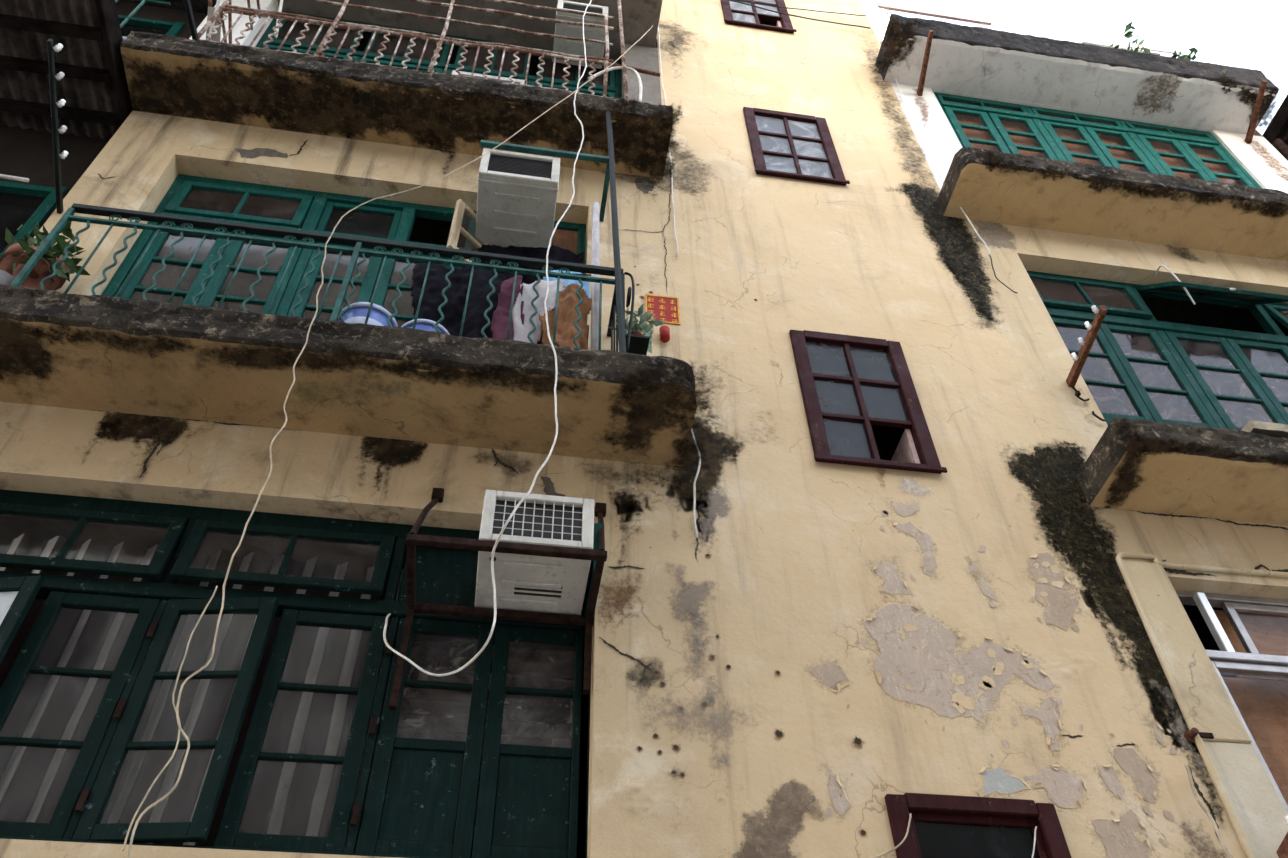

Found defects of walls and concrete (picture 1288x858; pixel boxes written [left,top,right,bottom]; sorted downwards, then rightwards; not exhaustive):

water stain [123,56,682,195]
water stain [1134,72,1181,115]
water stain [947,261,993,317]
water stain [0,316,586,396]
water stain [96,412,189,453]
water stain [359,436,428,484]
water stain [601,362,743,551]
water stain [610,492,641,564]
crack [1103,508,1288,530]
peeling [860,502,1177,858]
water stain [1082,581,1223,822]
water stain [733,781,823,858]